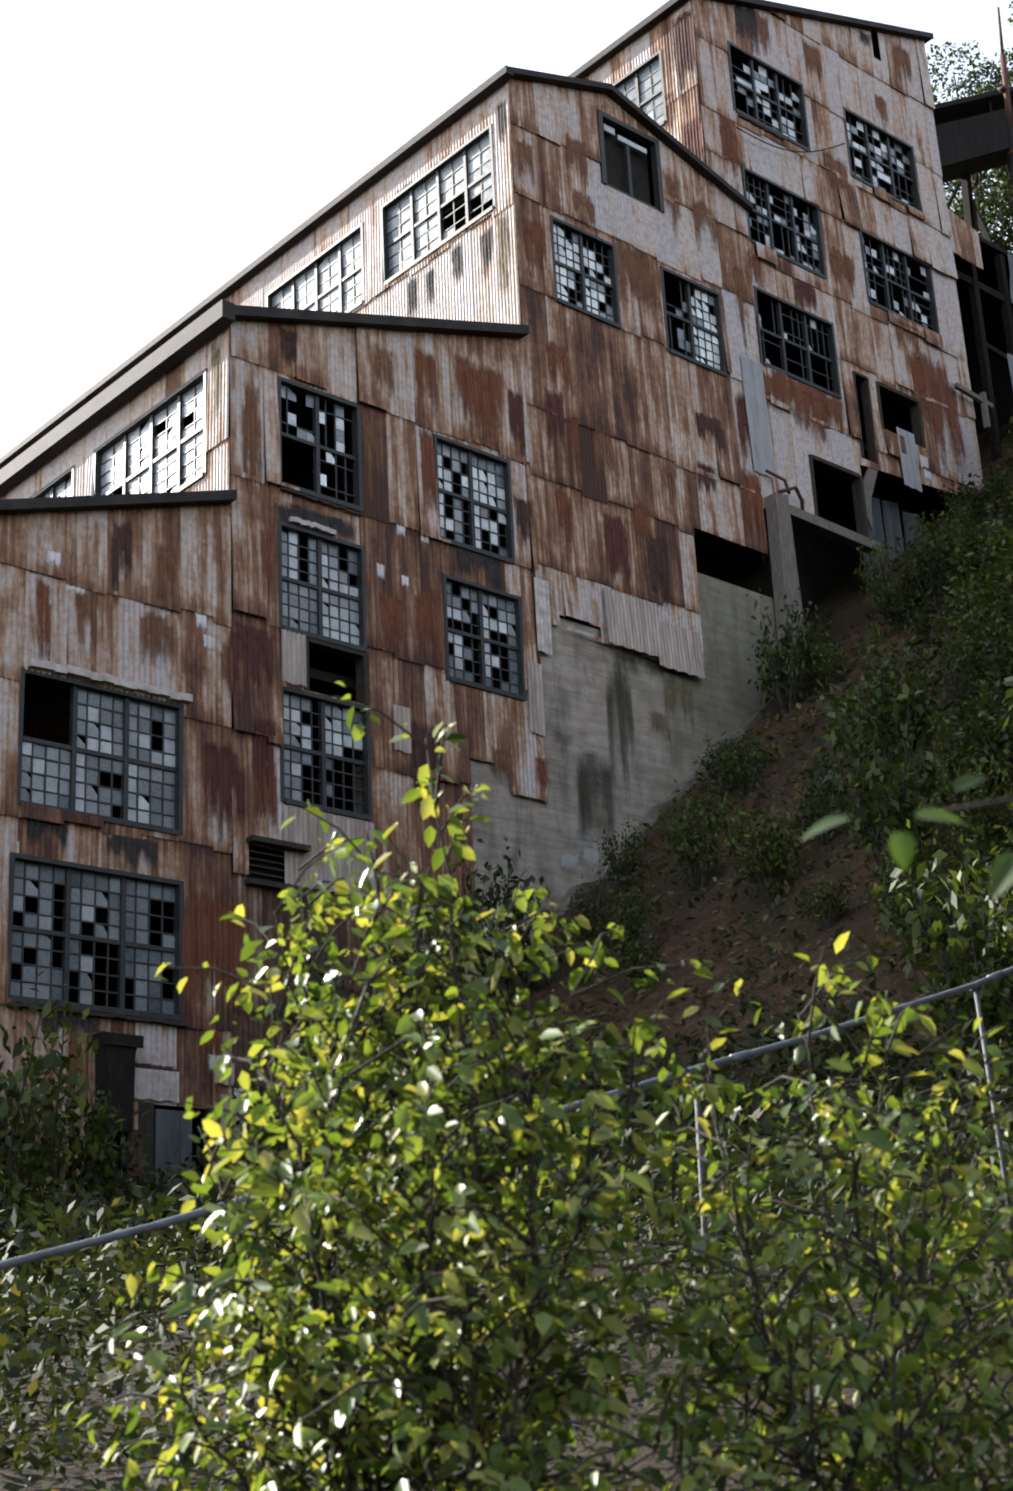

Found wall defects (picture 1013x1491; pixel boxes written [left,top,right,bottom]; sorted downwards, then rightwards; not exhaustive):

corrosion [664,12,738,175]
corrosion [803,42,823,76]
corrosion [566,134,595,227]
corrosion [415,352,438,407]
corrosion [456,354,525,456]
corrosion [420,431,438,512]
corrosion [513,496,533,537]
corrosion [37,579,51,661]
corrosion [78,522,132,643]
damp [607,652,688,745]
corrosion [203,717,278,842]
damp [579,753,612,819]